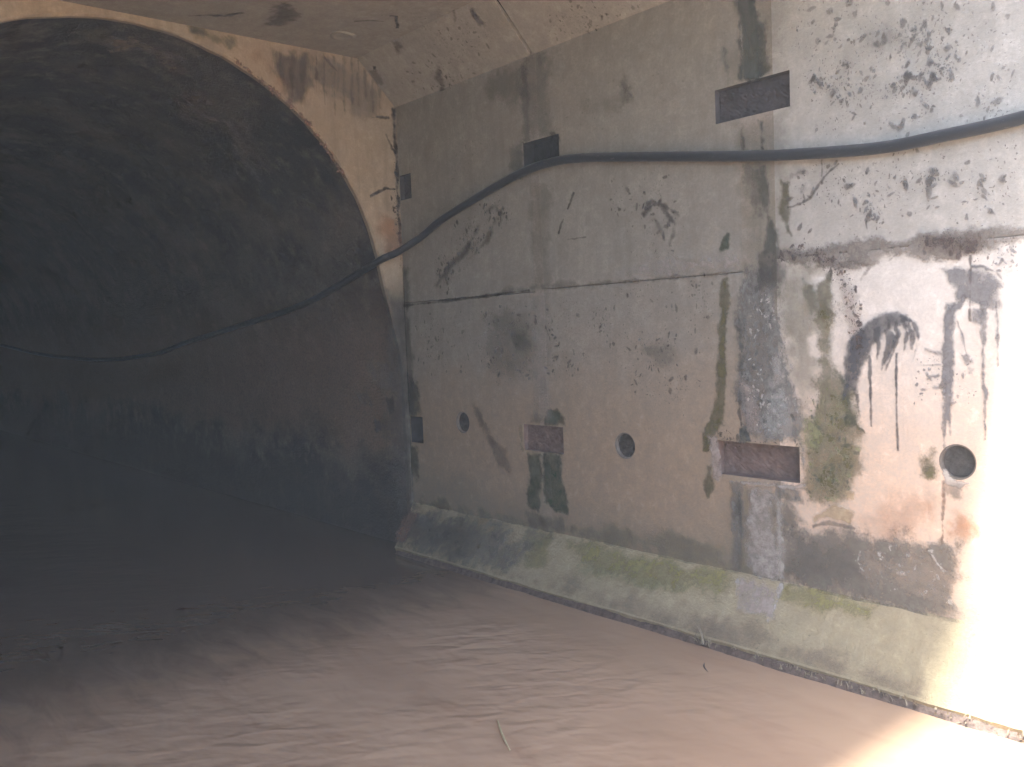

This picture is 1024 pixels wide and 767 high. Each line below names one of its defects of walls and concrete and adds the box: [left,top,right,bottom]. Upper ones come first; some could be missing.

leakage [734,166,803,443]
leakage [842,256,1001,451]
leakage [731,483,963,616]